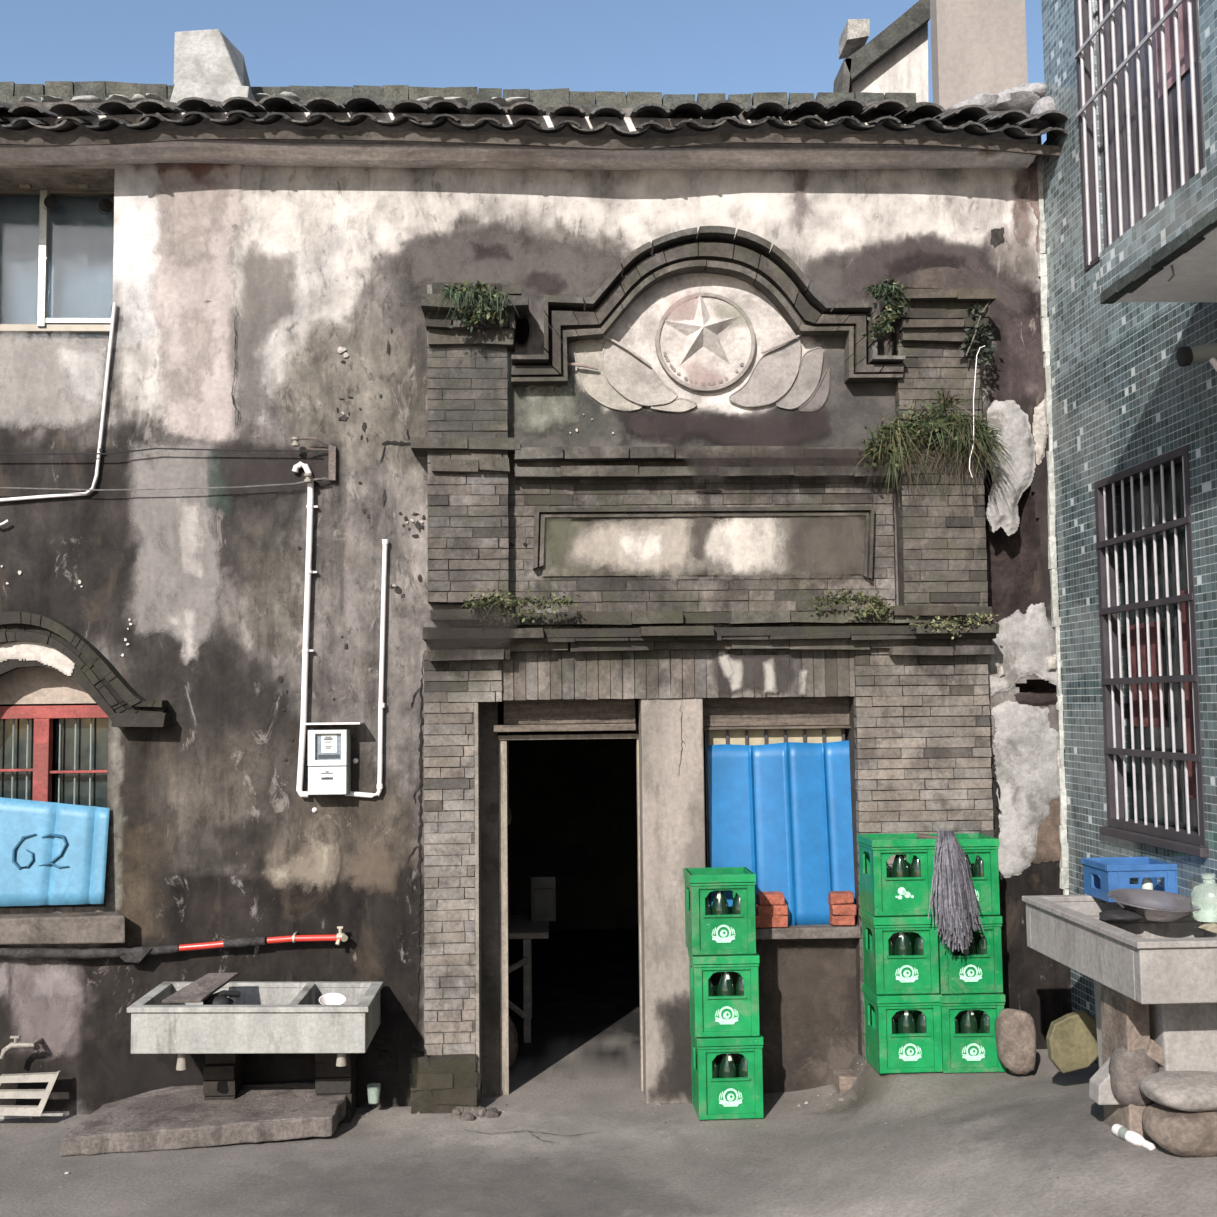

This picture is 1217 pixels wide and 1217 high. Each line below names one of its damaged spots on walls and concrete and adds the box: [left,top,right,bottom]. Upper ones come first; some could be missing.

damp [1013,171,1032,238]
damp [130,164,329,663]
damp [565,511,870,577]
peeling [983,470,1061,879]
damp [268,846,339,887]
damp [354,849,397,888]
damp [0,959,81,1057]
damp [88,1044,206,1102]
damp [243,1053,316,1085]
damp [355,1013,421,1107]